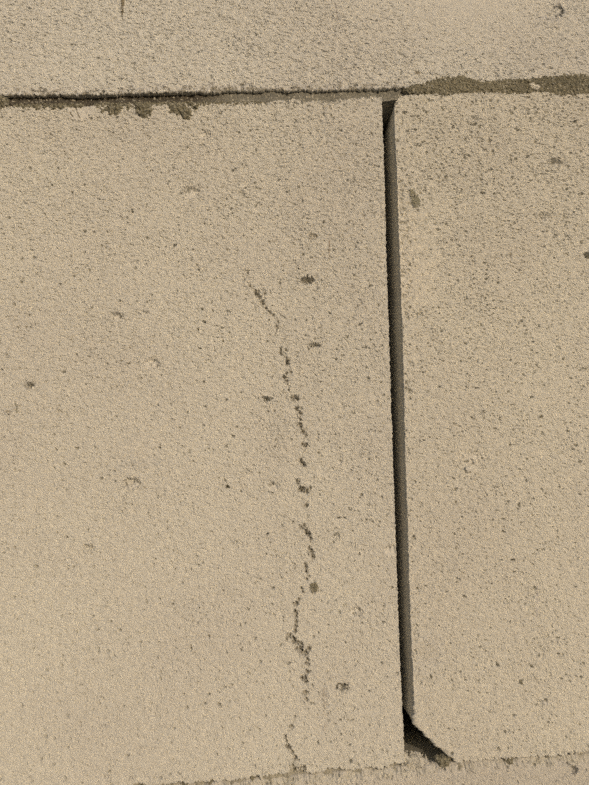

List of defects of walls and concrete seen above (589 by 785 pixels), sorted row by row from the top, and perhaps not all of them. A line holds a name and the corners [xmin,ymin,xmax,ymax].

crack [244,268,317,772]